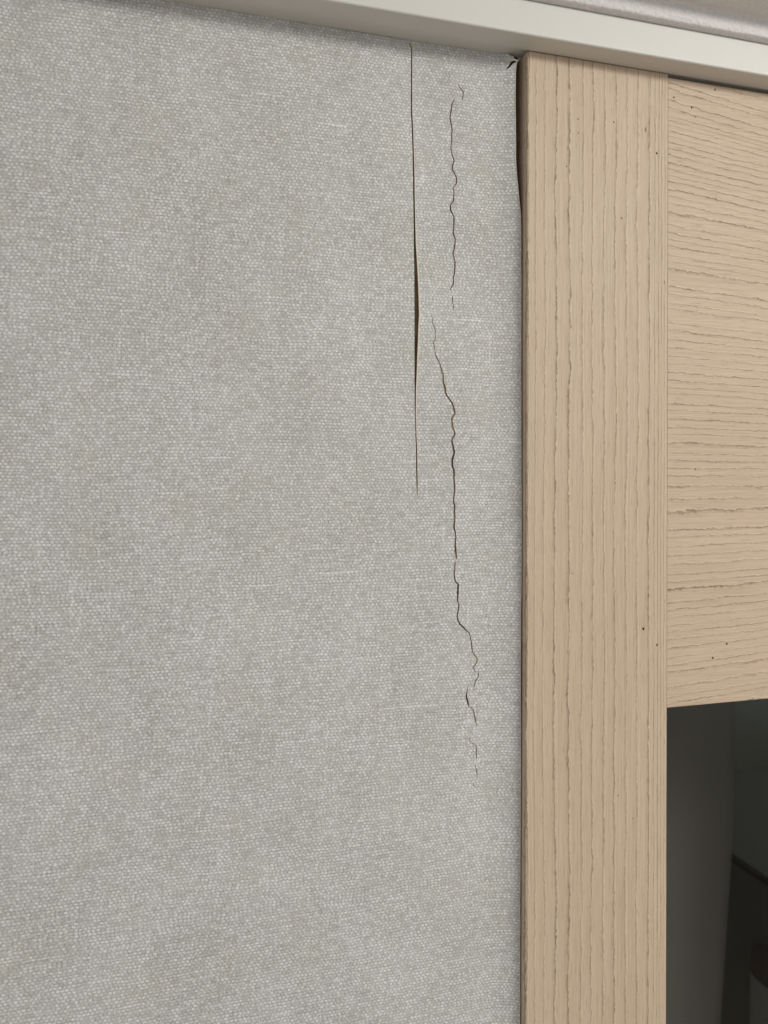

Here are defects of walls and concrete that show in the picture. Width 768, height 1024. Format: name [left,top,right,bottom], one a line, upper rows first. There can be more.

crack [432,85,479,786]